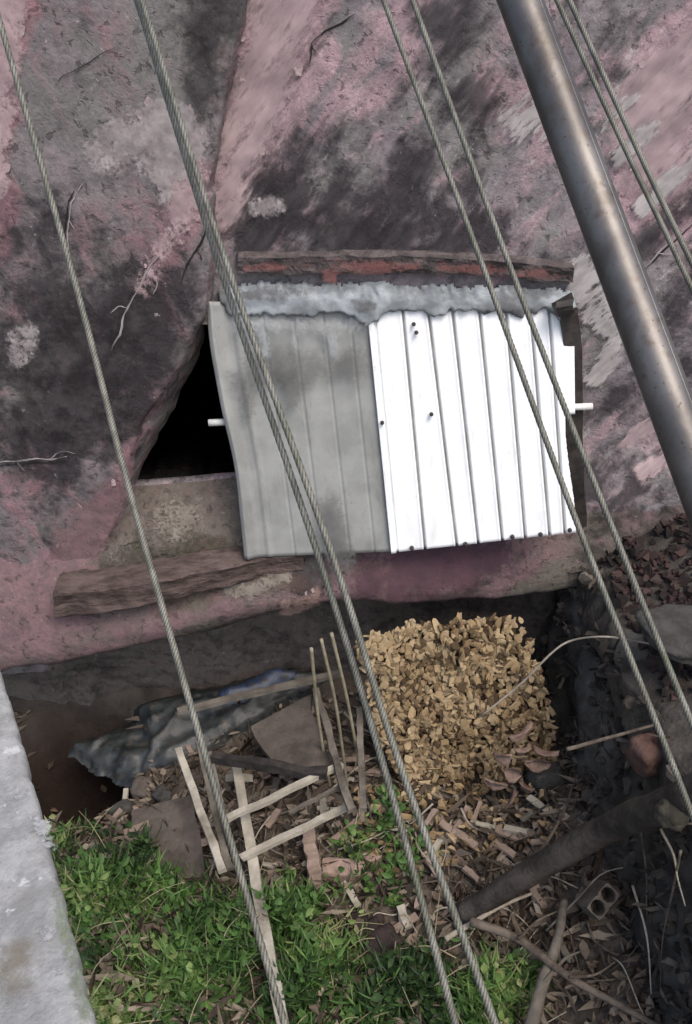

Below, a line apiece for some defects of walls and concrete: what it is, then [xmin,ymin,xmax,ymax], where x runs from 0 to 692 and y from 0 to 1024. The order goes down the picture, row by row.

crack [309,14,354,64]
crack [56,46,118,84]
damp [249,197,286,217]
crack [108,222,206,349]